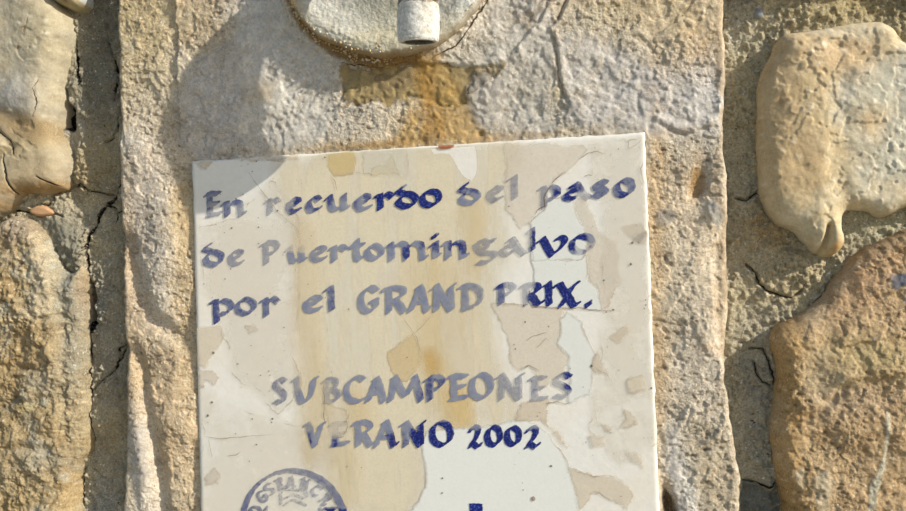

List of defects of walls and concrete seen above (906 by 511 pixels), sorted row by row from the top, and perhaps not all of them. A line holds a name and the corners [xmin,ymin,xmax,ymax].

crack [0,130,122,270]
peeling [329,152,356,176]
crack [89,321,127,438]
leakage [282,146,514,511]
peeling [387,335,419,382]
peeling [492,197,614,404]
peeling [412,399,633,511]